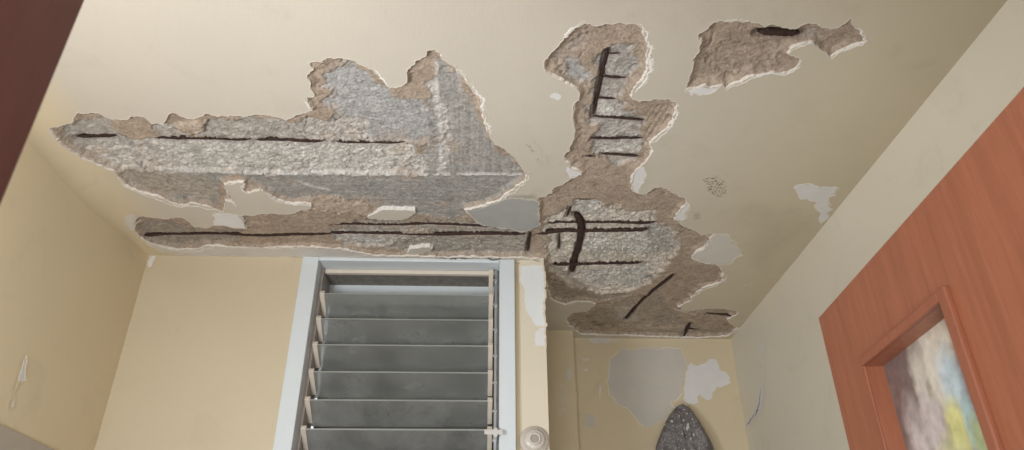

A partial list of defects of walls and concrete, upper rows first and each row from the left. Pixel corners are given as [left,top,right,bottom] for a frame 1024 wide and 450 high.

spalling [49,18,868,431]